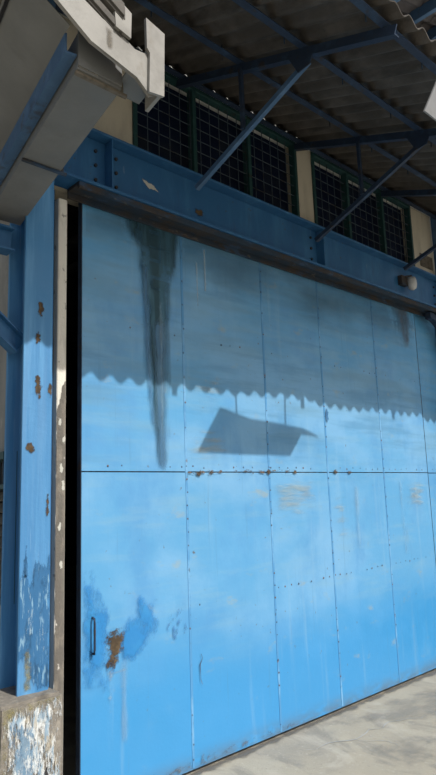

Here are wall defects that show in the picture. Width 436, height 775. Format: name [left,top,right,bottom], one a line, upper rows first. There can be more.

corrosion [35,375,53,399]
leakage [129,219,177,466]
peeling [3,381,66,775]
corrosion [106,628,124,669]